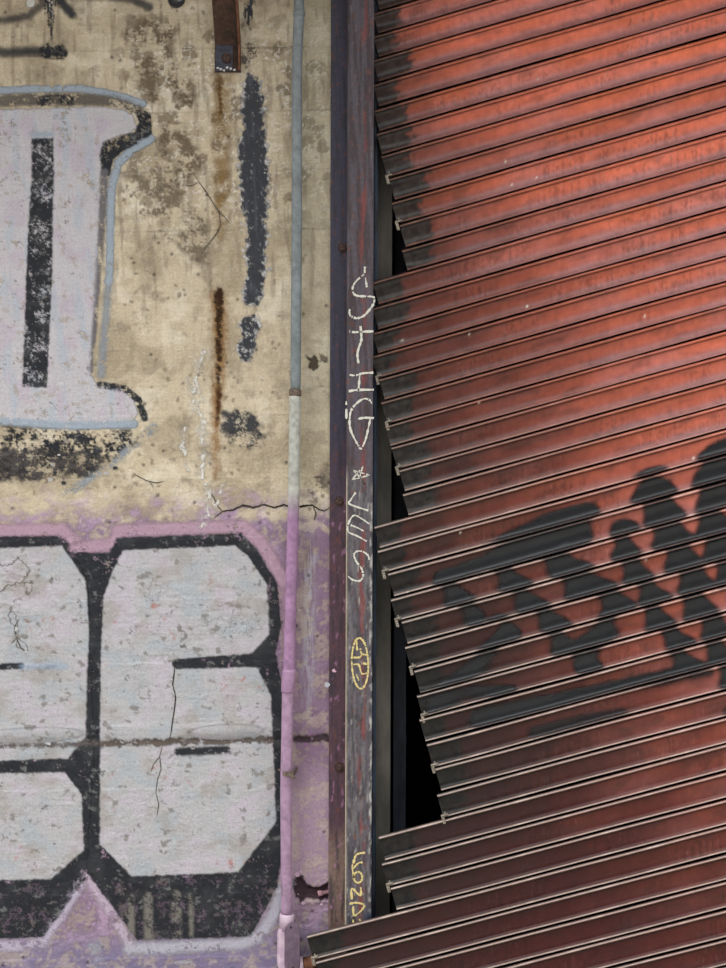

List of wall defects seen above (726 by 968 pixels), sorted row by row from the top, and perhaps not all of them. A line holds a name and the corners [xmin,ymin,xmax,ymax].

rust [212,288,225,449]
crack [211,494,330,520]